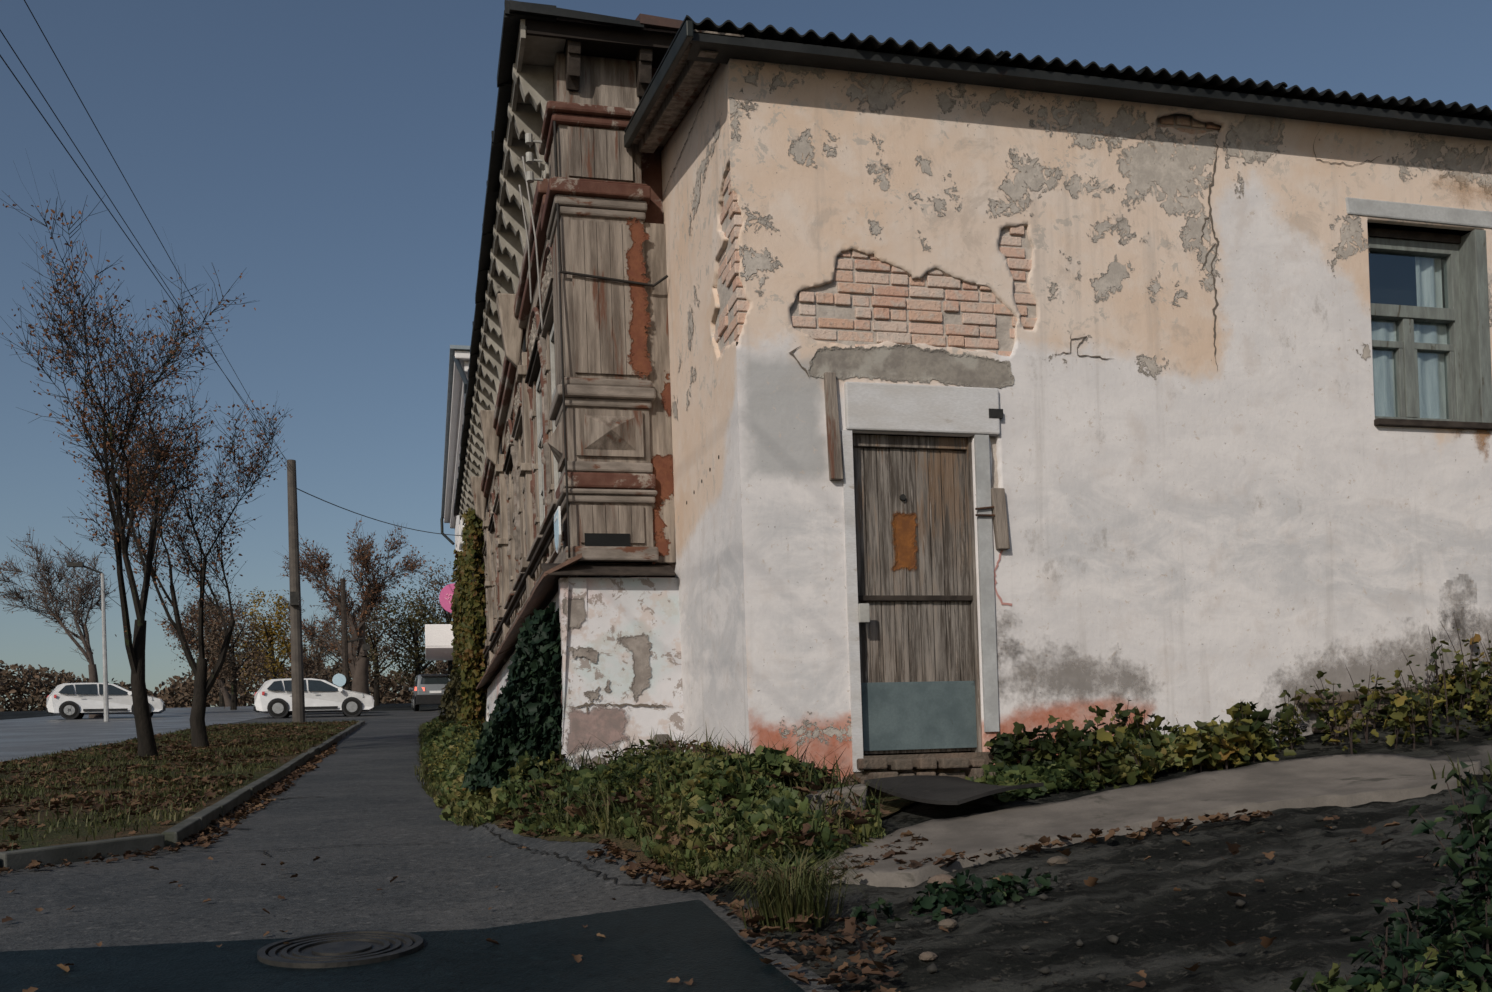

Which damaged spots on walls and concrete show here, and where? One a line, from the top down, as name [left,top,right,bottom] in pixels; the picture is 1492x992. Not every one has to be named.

peeling [624,217,700,421]
flaking render [689,62,1286,388]
crack [1201,135,1219,371]
flaking render [562,597,599,663]
flaking render [566,632,652,765]
flaking render [778,712,852,746]
damp [998,648,1147,697]
damp [1264,578,1492,742]